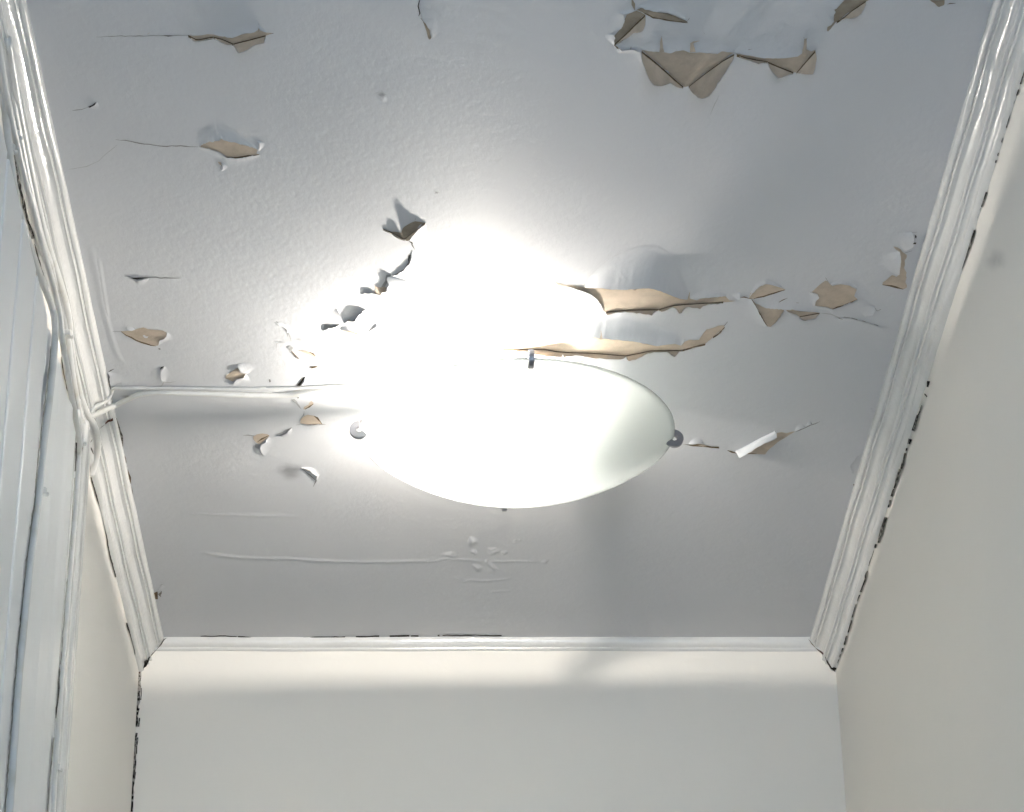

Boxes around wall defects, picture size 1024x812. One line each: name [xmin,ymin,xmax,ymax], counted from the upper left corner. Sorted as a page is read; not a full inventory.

peeling [823,0,868,31]
peeling [104,21,273,53]
peeling [605,0,817,112]
peeling [74,124,266,171]
peeling [383,221,428,248]
peeling [878,232,917,289]
peeling [322,245,858,363]
peeling [121,325,174,350]
peeling [225,362,257,386]
peeling [245,397,323,455]
peeling [727,420,818,458]
peeling [301,467,320,485]